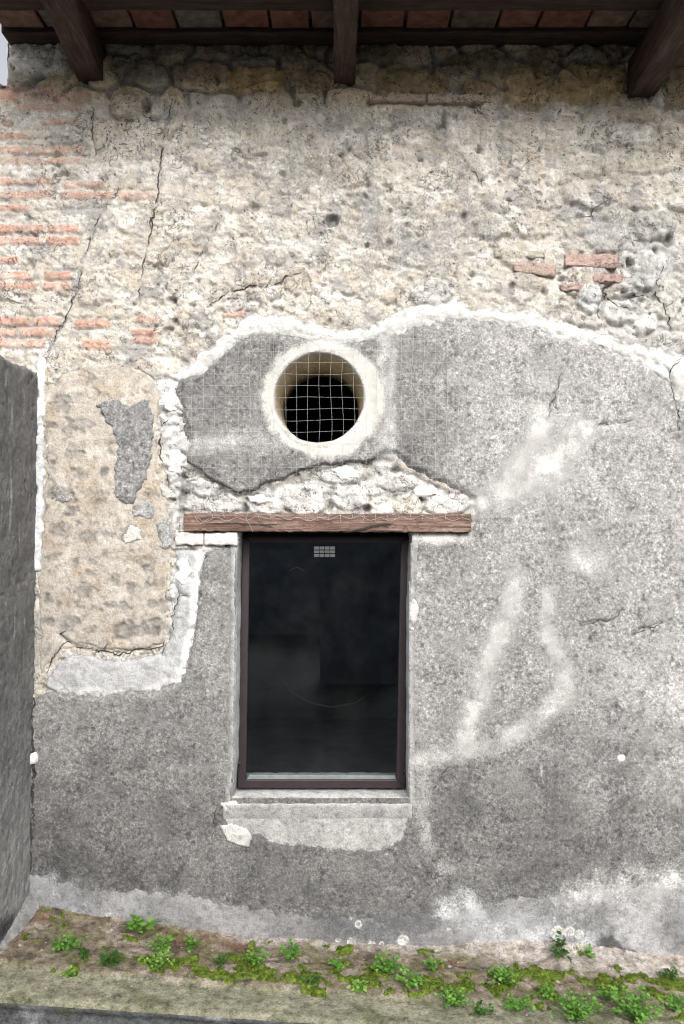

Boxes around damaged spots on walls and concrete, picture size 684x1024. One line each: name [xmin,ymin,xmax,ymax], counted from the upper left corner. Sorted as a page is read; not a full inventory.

crack [138,103,172,297]
crack [45,190,118,358]
crack [207,272,302,307]
crack [597,266,684,430]
damp [464,401,598,518]
spalling [38,363,472,676]
damp [412,532,471,546]
crack [46,586,187,673]
damp [409,568,575,848]
damp [333,889,558,942]
damp [578,930,636,952]
damp [555,867,684,910]